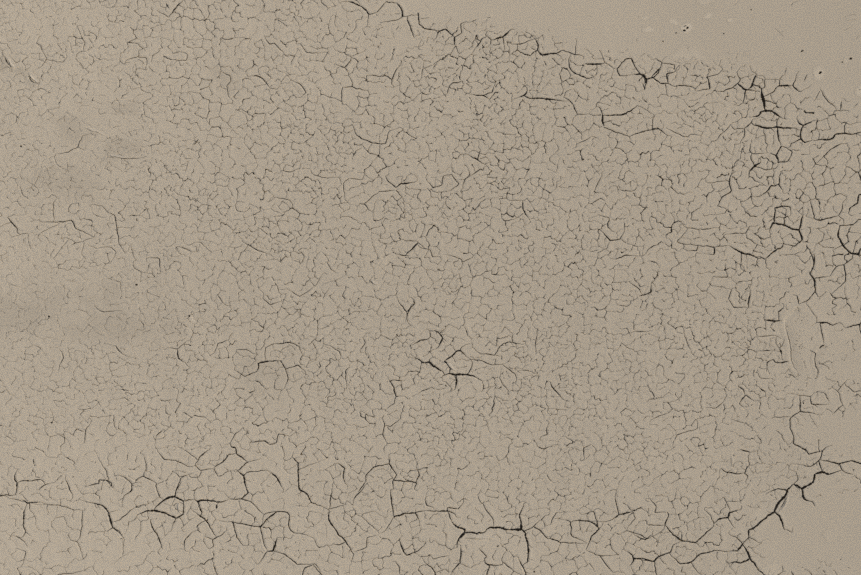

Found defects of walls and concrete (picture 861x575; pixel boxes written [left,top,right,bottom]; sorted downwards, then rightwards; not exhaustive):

crack [348,0,464,45]
crack [341,51,397,99]
crack [312,173,459,203]
crack [488,29,861,342]
crack [41,212,160,273]
crack [405,240,471,265]
crack [216,340,306,386]
crack [415,330,519,413]
crack [0,380,861,575]